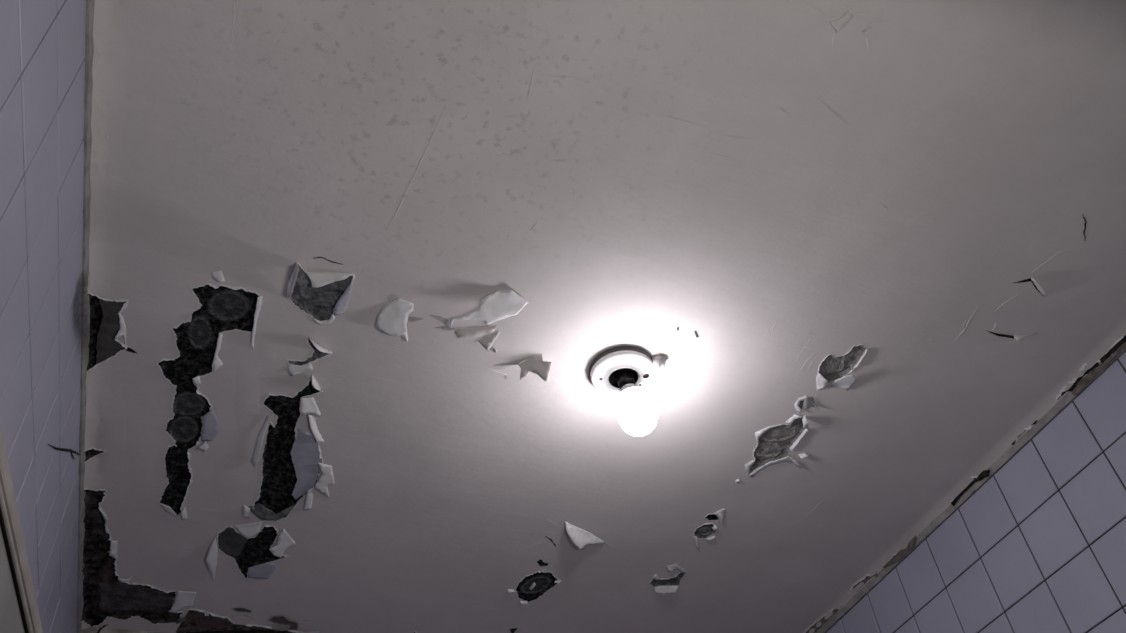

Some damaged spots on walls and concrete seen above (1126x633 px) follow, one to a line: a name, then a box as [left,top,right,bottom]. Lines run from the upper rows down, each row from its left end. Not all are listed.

spalling [86,288,138,372]
peeling [287,262,355,325]
peeling [376,290,551,382]
spalling [157,270,263,520]
peeling [735,344,868,484]
spalling [206,336,335,581]
spalling [81,488,196,633]
spalling [507,559,562,605]
peeling [548,520,614,550]
peeling [649,564,687,594]
peeling [693,509,726,549]